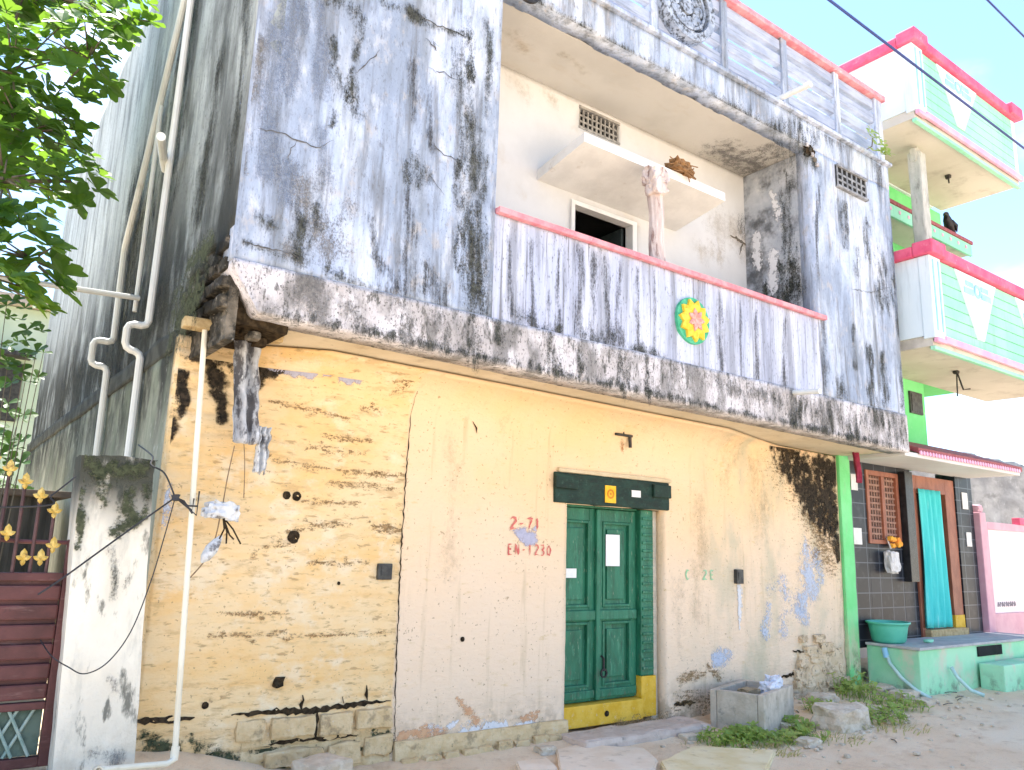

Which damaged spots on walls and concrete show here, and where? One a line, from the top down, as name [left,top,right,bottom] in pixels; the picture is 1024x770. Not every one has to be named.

crack [258,128,333,161]
water stain [224,0,371,321]
water stain [574,246,688,403]
water stain [170,357,233,443]
peeling [268,368,362,385]
water stain [74,477,153,551]
crack [231,391,418,747]
peeling [513,526,538,546]
peeling [760,540,824,640]
water stain [770,446,840,576]
crack [137,715,195,725]
flaking render [396,697,540,741]